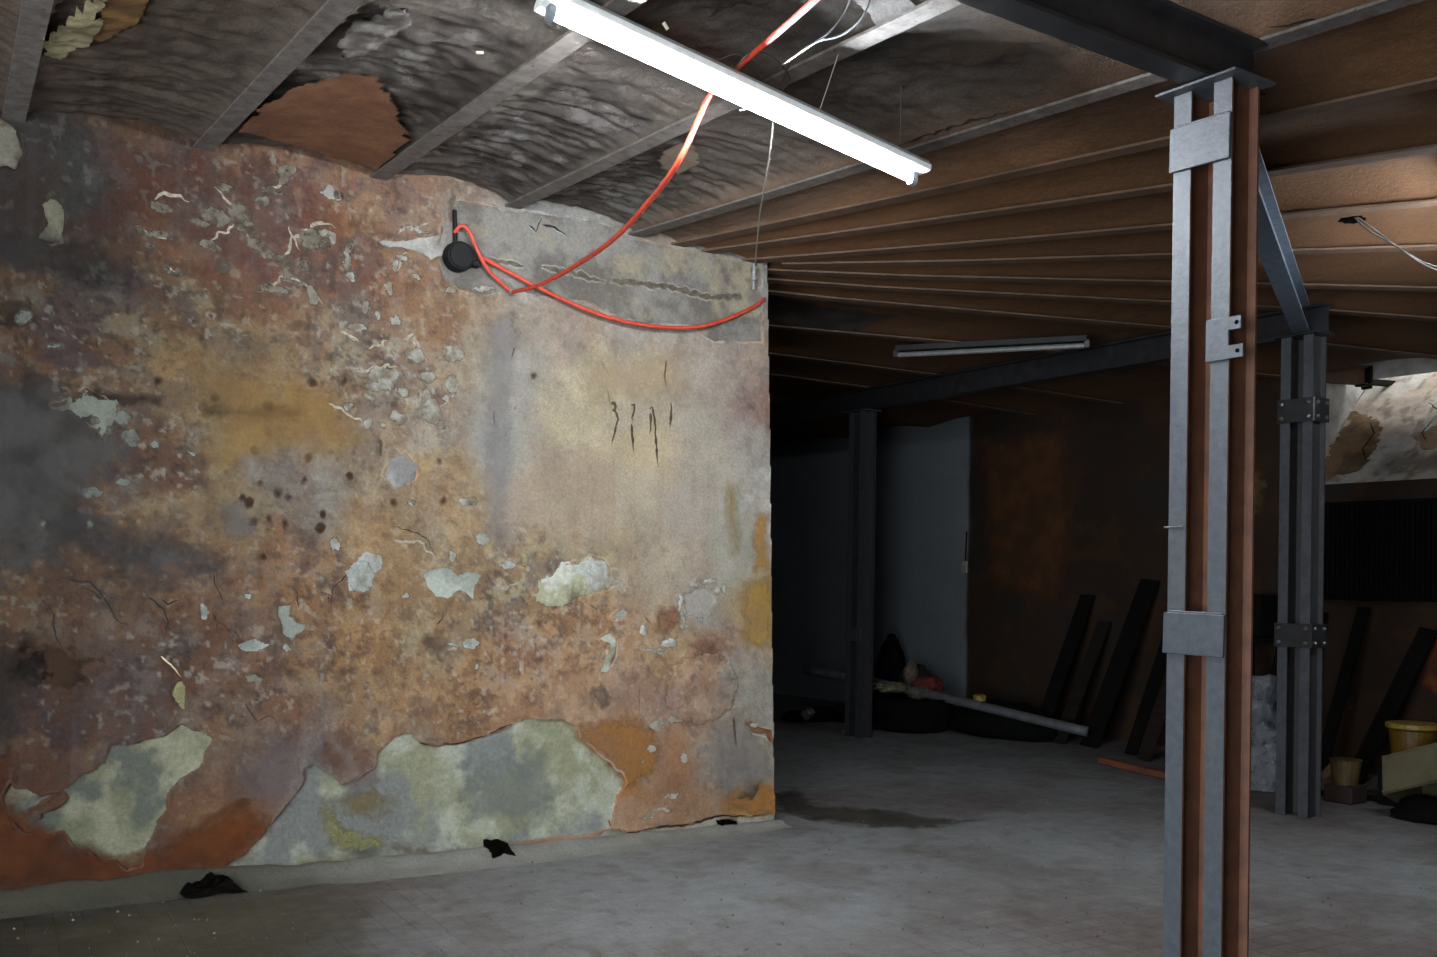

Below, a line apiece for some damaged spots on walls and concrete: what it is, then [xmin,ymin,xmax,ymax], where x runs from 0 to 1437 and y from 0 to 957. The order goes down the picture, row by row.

spalling [43,0,149,60]
flaking render [0,115,27,169]
flaking render [1325,411,1383,481]
peeling [424,566,485,605]
flaking render [535,554,627,672]
corrosion [657,607,679,633]
corrosion [744,516,771,646]
peeling [0,678,215,872]
corrosion [0,767,265,889]
peeling [180,716,775,899]
corrosion [581,720,658,786]
corrosion [726,784,775,815]